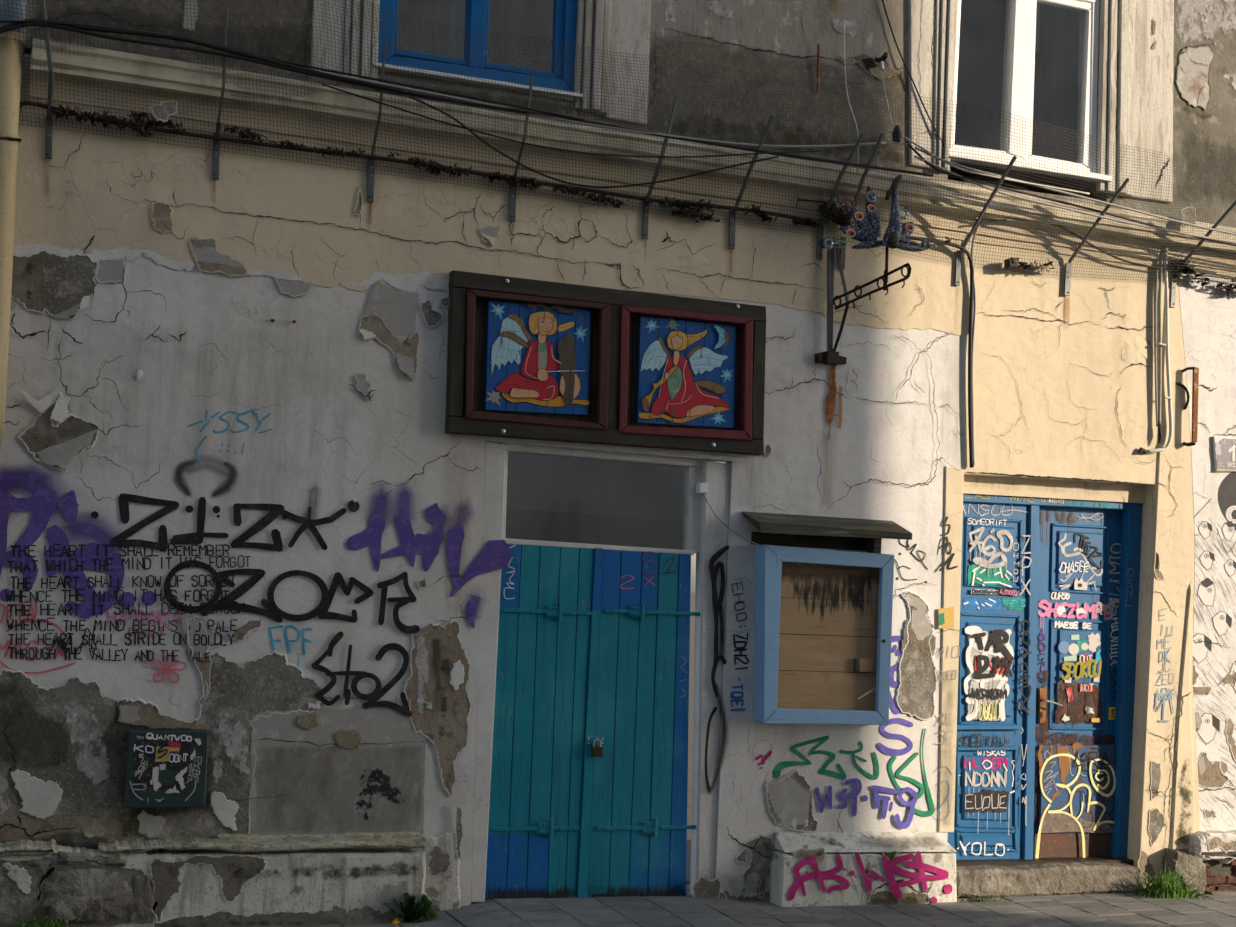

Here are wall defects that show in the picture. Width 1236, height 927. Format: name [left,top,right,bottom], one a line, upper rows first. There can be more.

damp [32,0,313,79]
peeling [1175,45,1215,118]
peeling [18,389,99,472]
peeling [10,250,126,320]
crack [106,170,1210,518]
corrosion [826,365,843,439]
peeling [895,591,937,721]
peeling [0,615,410,927]
peeling [403,620,472,877]
peeling [692,769,818,902]
crack [1146,683,1236,848]
peeling [1198,718,1236,789]